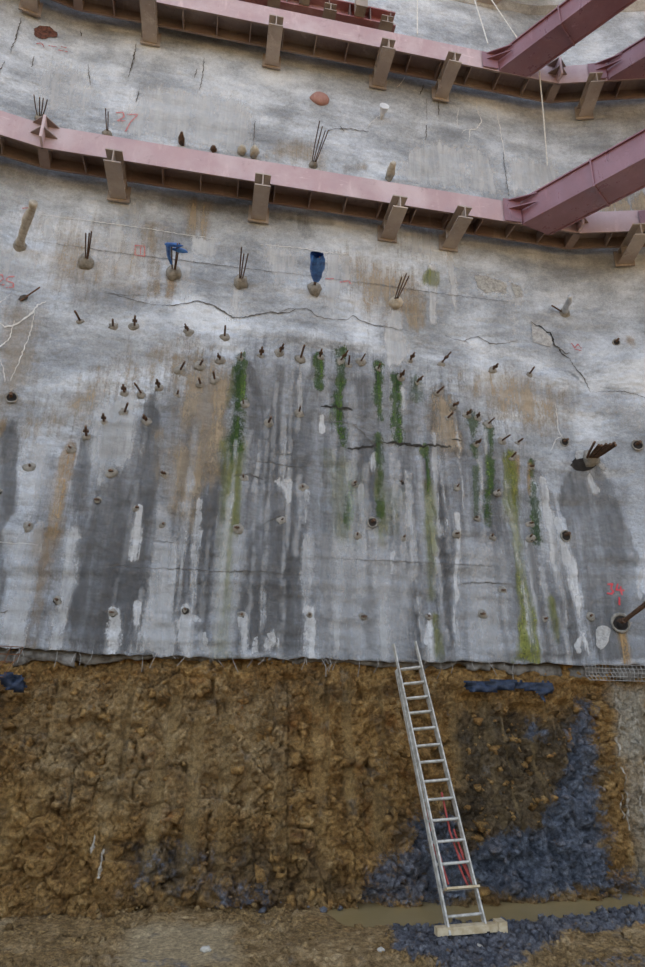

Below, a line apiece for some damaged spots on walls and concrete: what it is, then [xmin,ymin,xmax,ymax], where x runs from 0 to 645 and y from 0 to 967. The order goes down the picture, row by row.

crack [105,291,407,331]
crack [450,322,645,398]
crack [321,405,462,450]
damp [129,472,145,561]
damp [276,478,292,503]
damp [51,528,81,650]
damp [106,607,121,654]
damp [133,601,141,626]
damp [238,520,316,659]
damp [417,613,436,662]
damp [430,487,461,632]
damp [540,468,625,659]